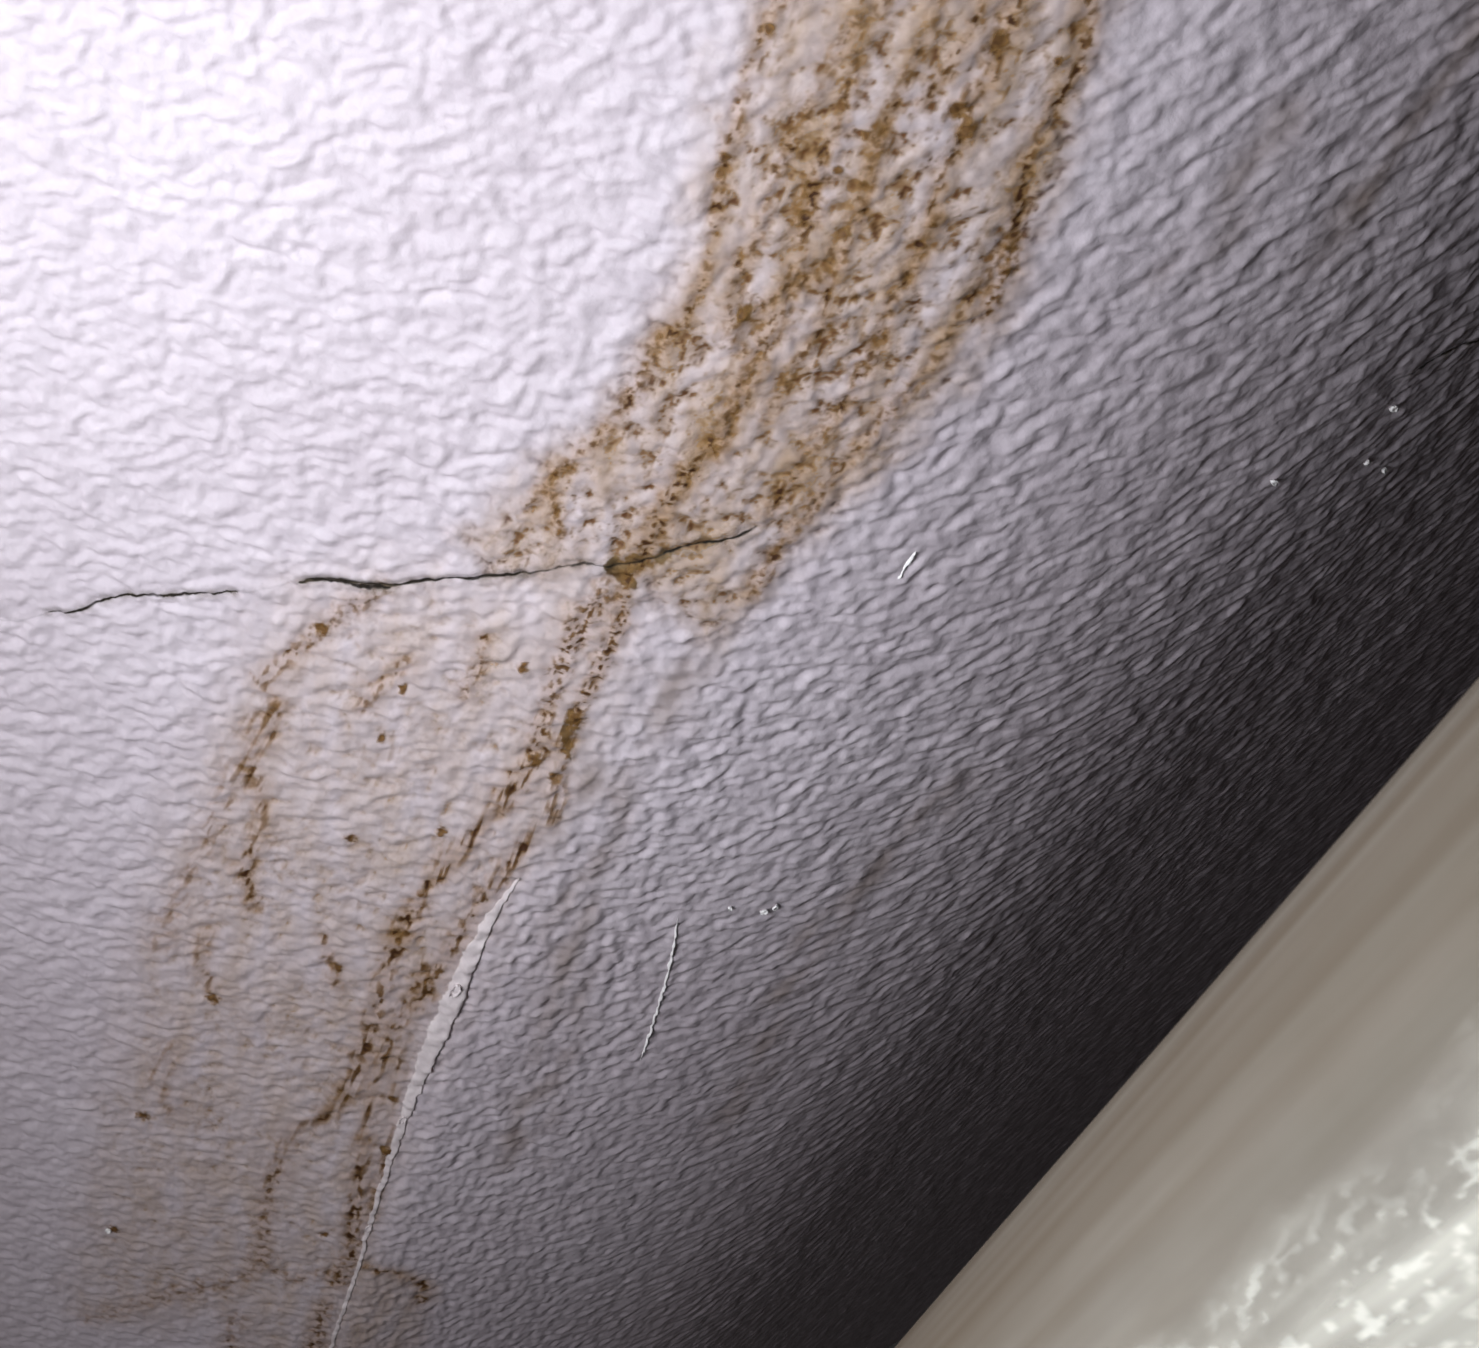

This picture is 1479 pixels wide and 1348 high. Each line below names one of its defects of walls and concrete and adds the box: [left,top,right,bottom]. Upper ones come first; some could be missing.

crack [1384,340,1479,389]
crack [298,526,757,590]
crack [49,590,238,614]
damp [229,582,387,936]
damp [297,566,634,1146]
damp [205,974,220,1004]
damp [252,1160,282,1272]
damp [305,1137,392,1285]
damp [307,1308,328,1348]